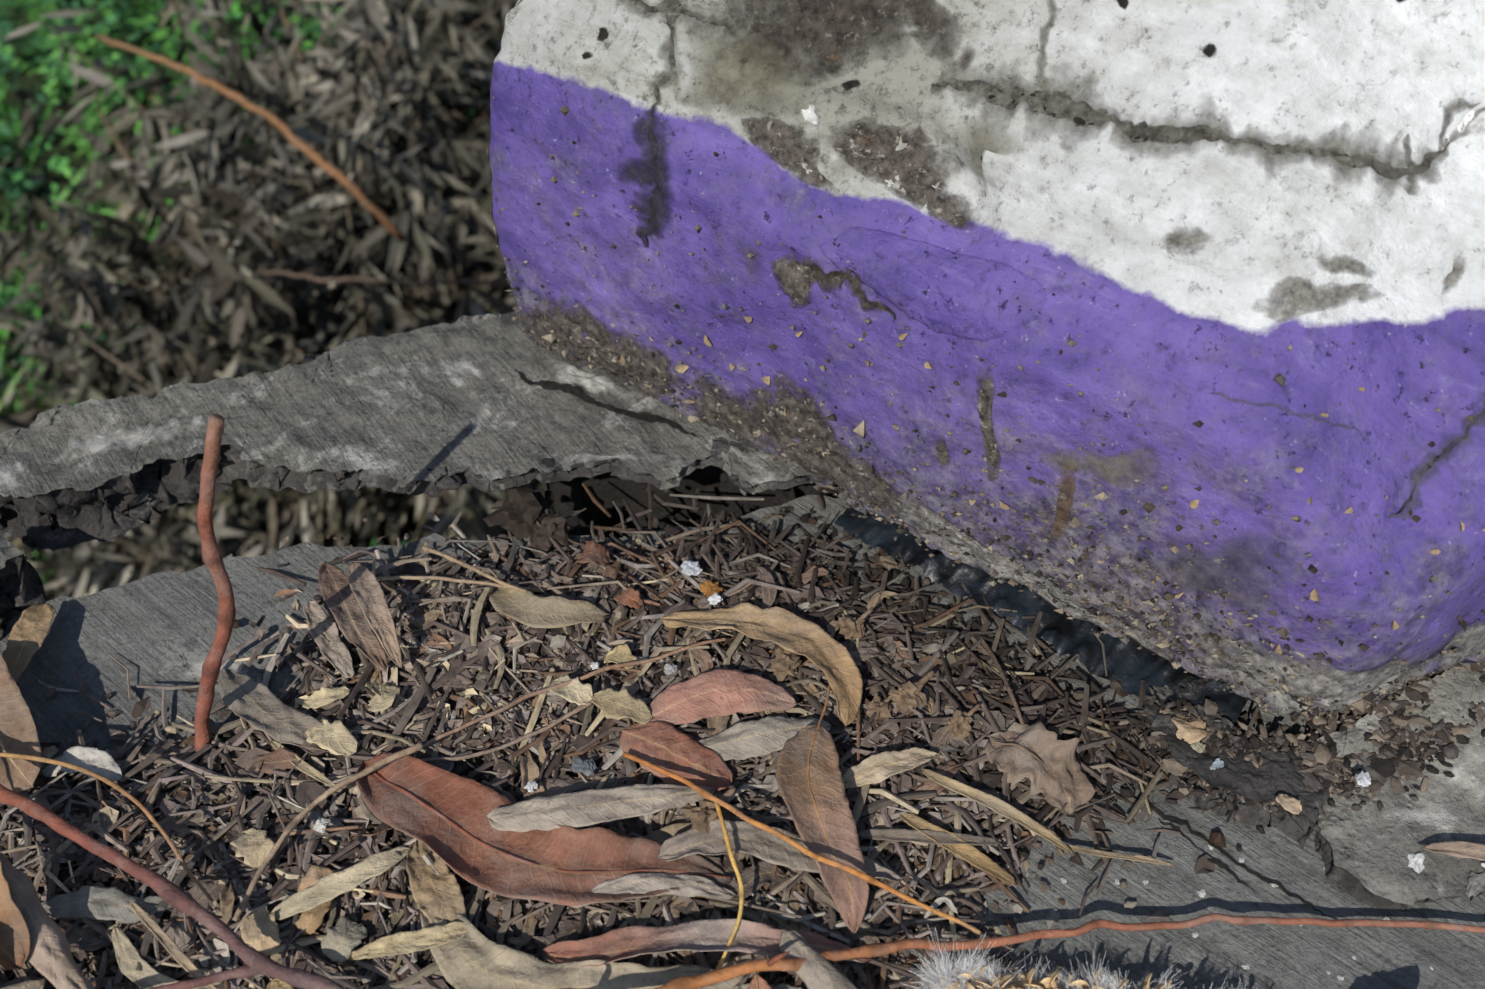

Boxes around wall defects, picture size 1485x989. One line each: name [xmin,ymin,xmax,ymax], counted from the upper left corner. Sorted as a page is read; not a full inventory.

crack [620,0,757,248]
crack [931,0,1485,194]
crack [515,369,698,438]
crack [1388,401,1485,518]